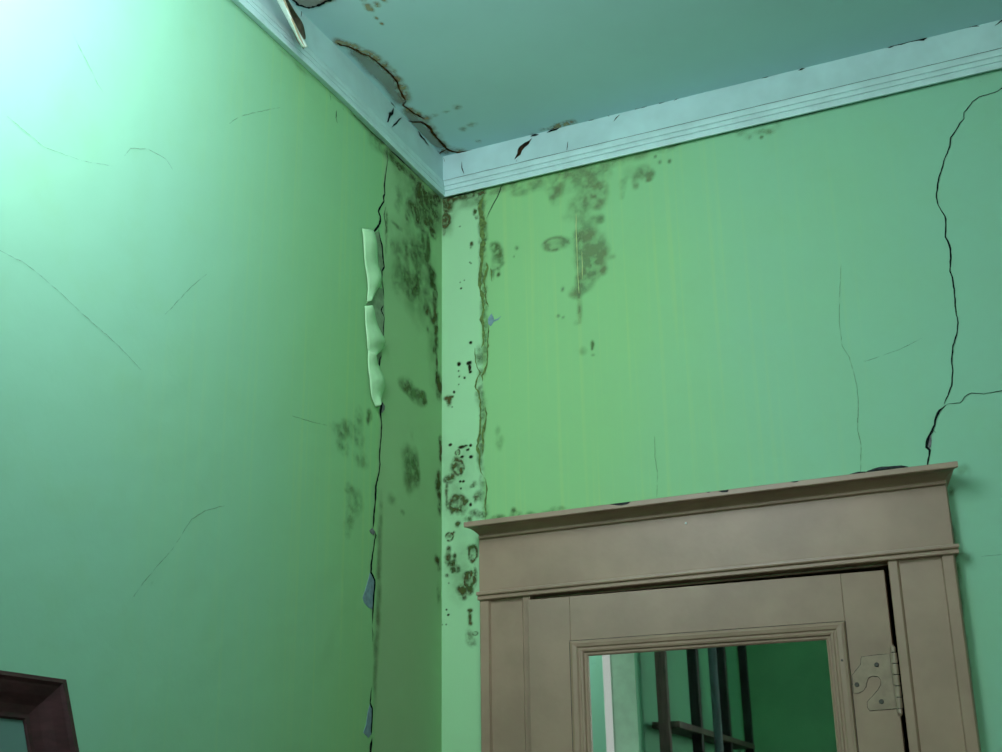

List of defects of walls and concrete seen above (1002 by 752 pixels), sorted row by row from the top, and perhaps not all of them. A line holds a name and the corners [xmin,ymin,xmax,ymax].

flaking render [292,0,332,9]
peeling [362,228,385,413]
crack [374,155,388,366]
leakage [389,154,502,407]
leakage [544,173,606,312]
crack [925,88,1002,465]
crack [370,403,383,642]
mould [406,451,419,486]
mould [435,437,483,634]
crack [367,689,375,752]